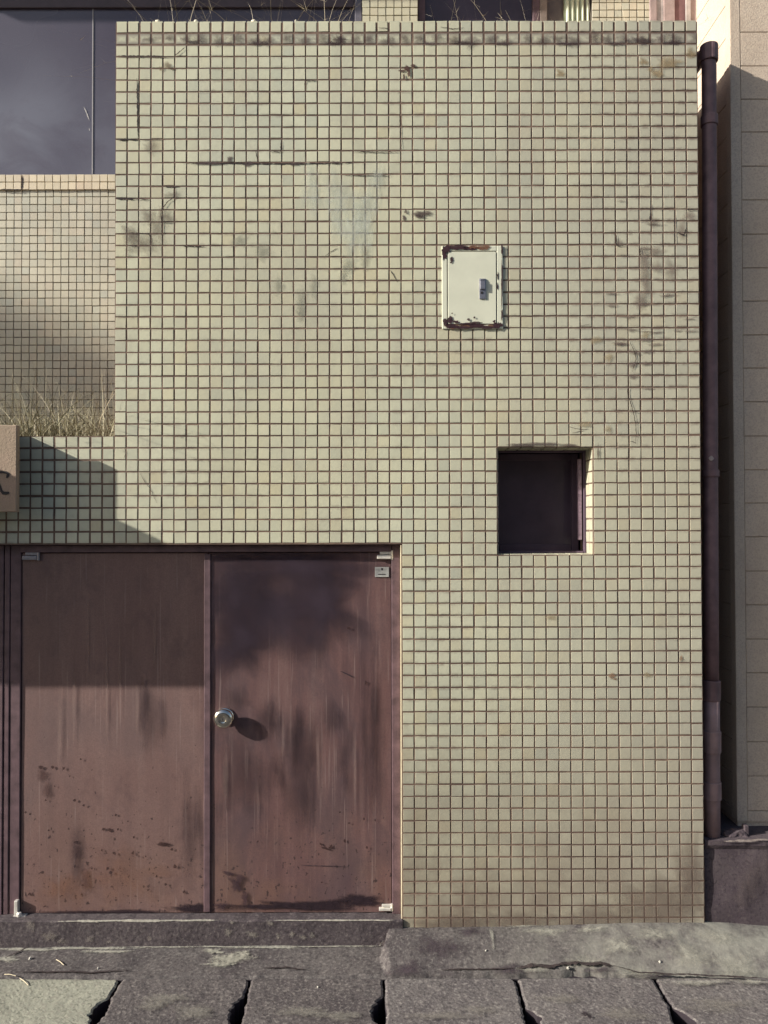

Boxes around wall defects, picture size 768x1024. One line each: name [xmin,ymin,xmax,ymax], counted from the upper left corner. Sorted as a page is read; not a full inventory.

rust [444,244,503,329]
crack [442,960,768,979]